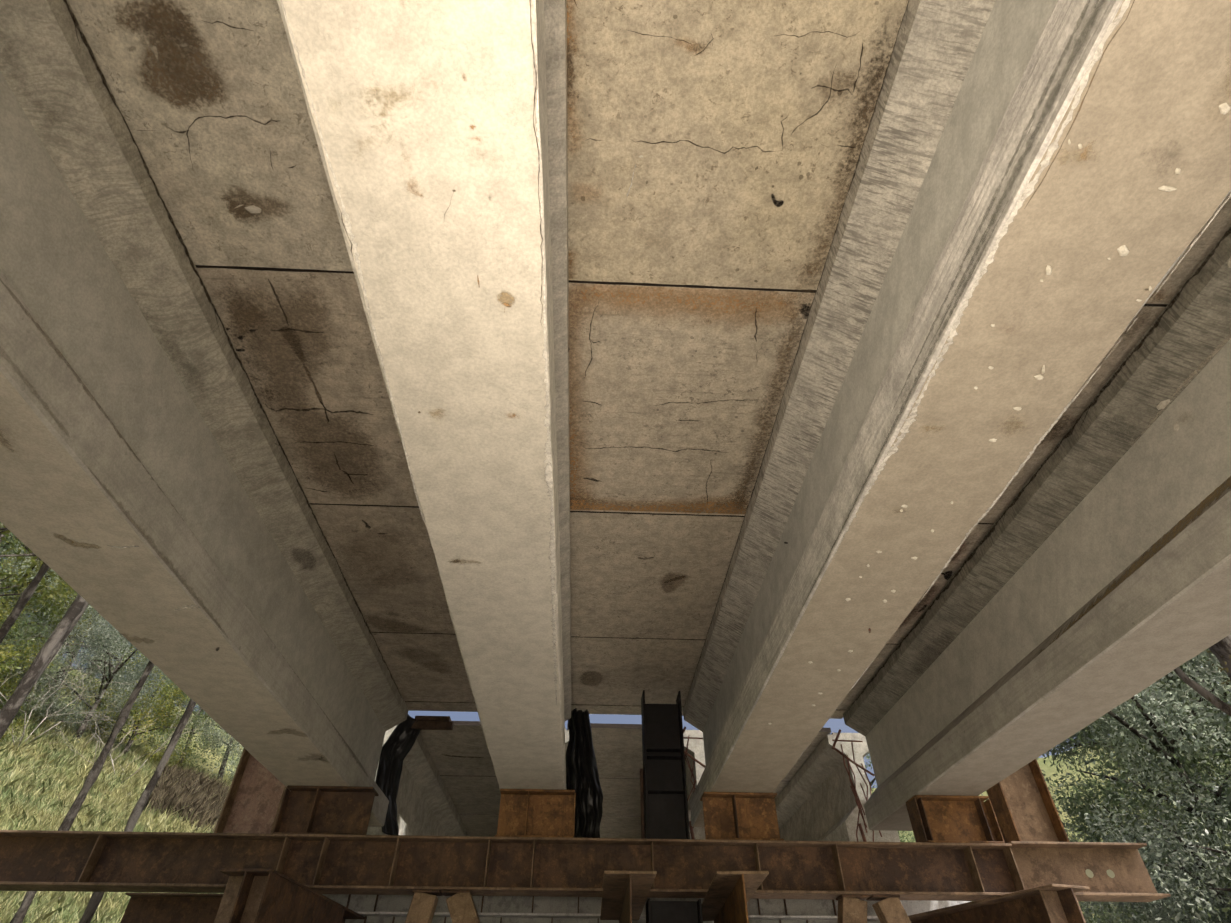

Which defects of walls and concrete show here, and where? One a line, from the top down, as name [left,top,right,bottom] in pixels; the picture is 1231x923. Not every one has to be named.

damp [118,0,225,107]
corrosion [567,1,576,140]
damp [224,188,287,219]
corrosion [568,253,796,315]
crack [64,0,402,697]
damp [231,294,377,495]
crack [585,308,600,405]
corrosion [569,367,748,514]
crack [588,400,744,504]
crack [632,1,909,694]
corrosion [900,586,935,626]